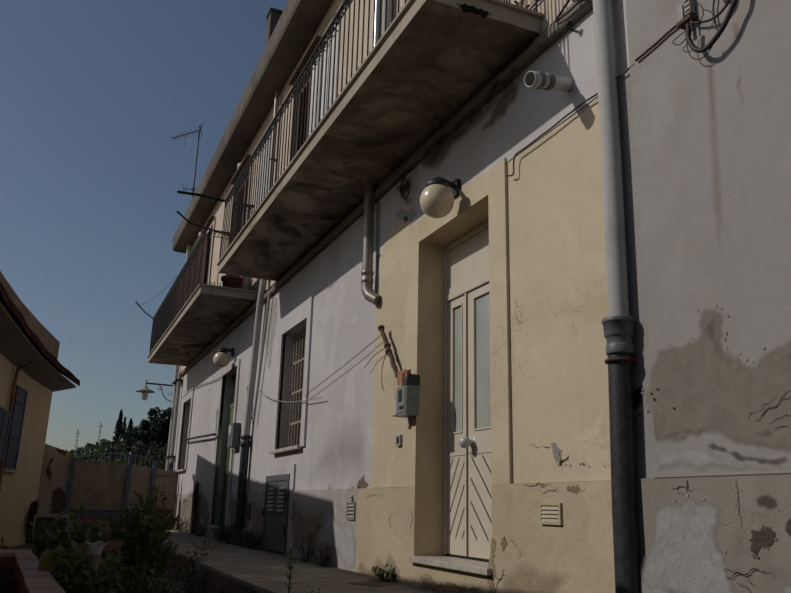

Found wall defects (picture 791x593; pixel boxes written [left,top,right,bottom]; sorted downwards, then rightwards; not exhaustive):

spalling [456,2,492,23]
water stain [422,68,517,167]
peeling [633,305,791,449]
crack [747,390,791,430]
peeling [551,443,562,466]
peeling [641,494,732,593]
flaking render [749,524,778,559]
flaking render [419,536,507,593]
crack [723,568,771,593]